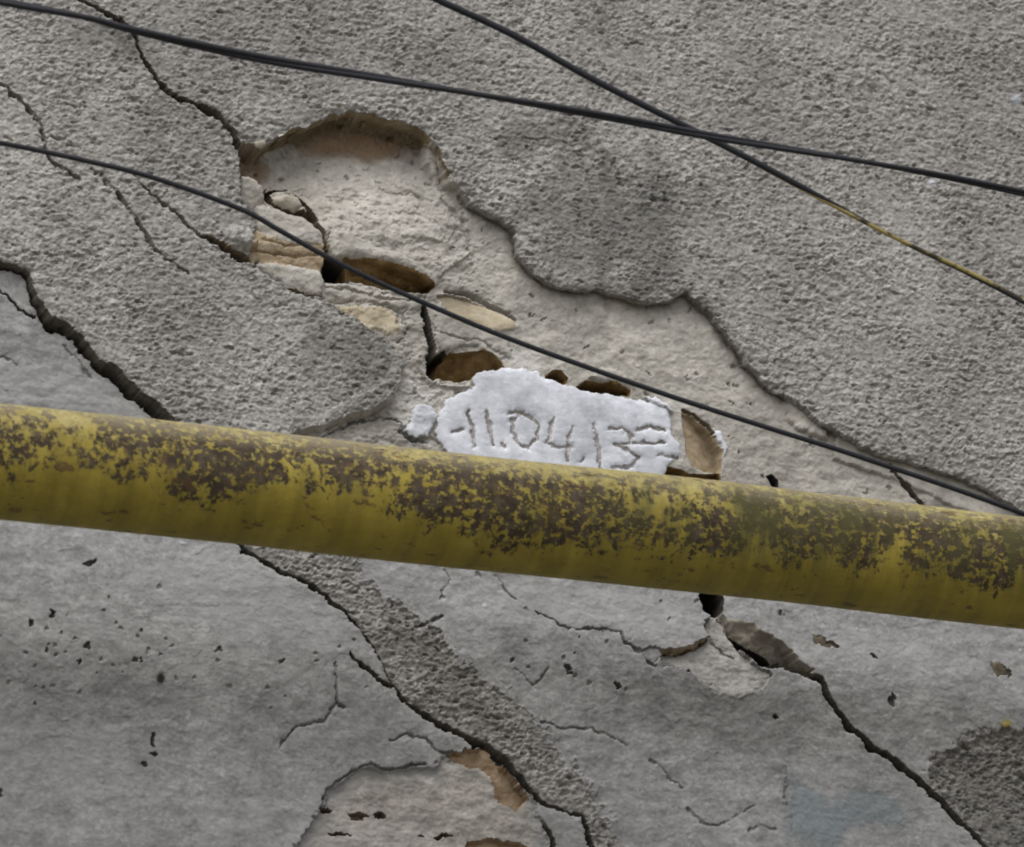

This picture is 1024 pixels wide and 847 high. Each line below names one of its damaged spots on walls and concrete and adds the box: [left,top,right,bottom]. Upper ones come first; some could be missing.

crack [77,0,241,150]
crack [0,82,205,275]
crack [0,260,176,421]
spalling [200,110,1021,517]
crack [236,544,595,847]
spalling [293,747,550,847]
crack [494,575,658,668]
crack [804,673,987,847]
spalling [923,725,1024,847]